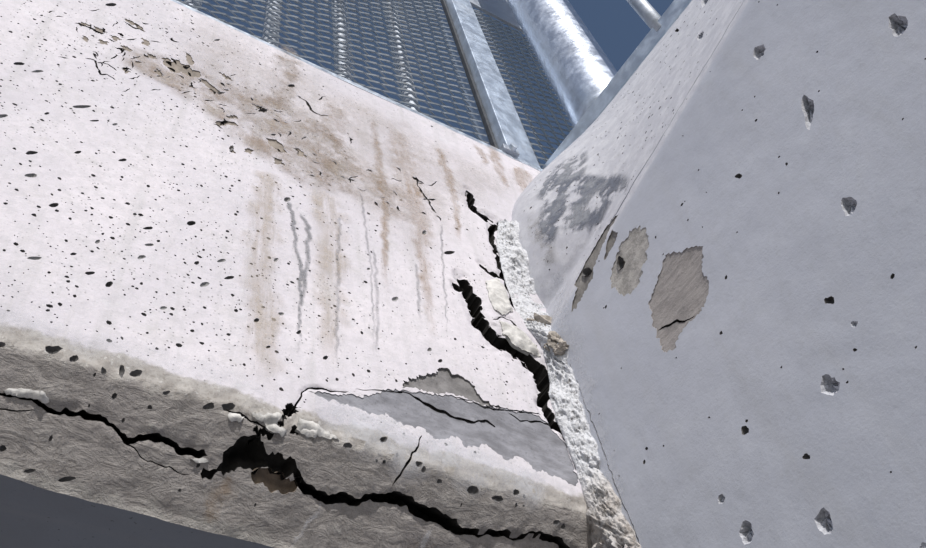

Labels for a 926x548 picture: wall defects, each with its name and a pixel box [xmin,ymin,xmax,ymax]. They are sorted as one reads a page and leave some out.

crack [49,9,441,221]
water stain [205,84,402,197]
water stain [288,203,311,326]
crack [391,190,576,470]
peeling [572,215,649,311]
peeling [648,246,709,353]
crack [0,393,208,475]
crack [225,387,348,431]
crack [294,436,570,548]
spalling [309,368,578,486]
crack [570,364,640,544]